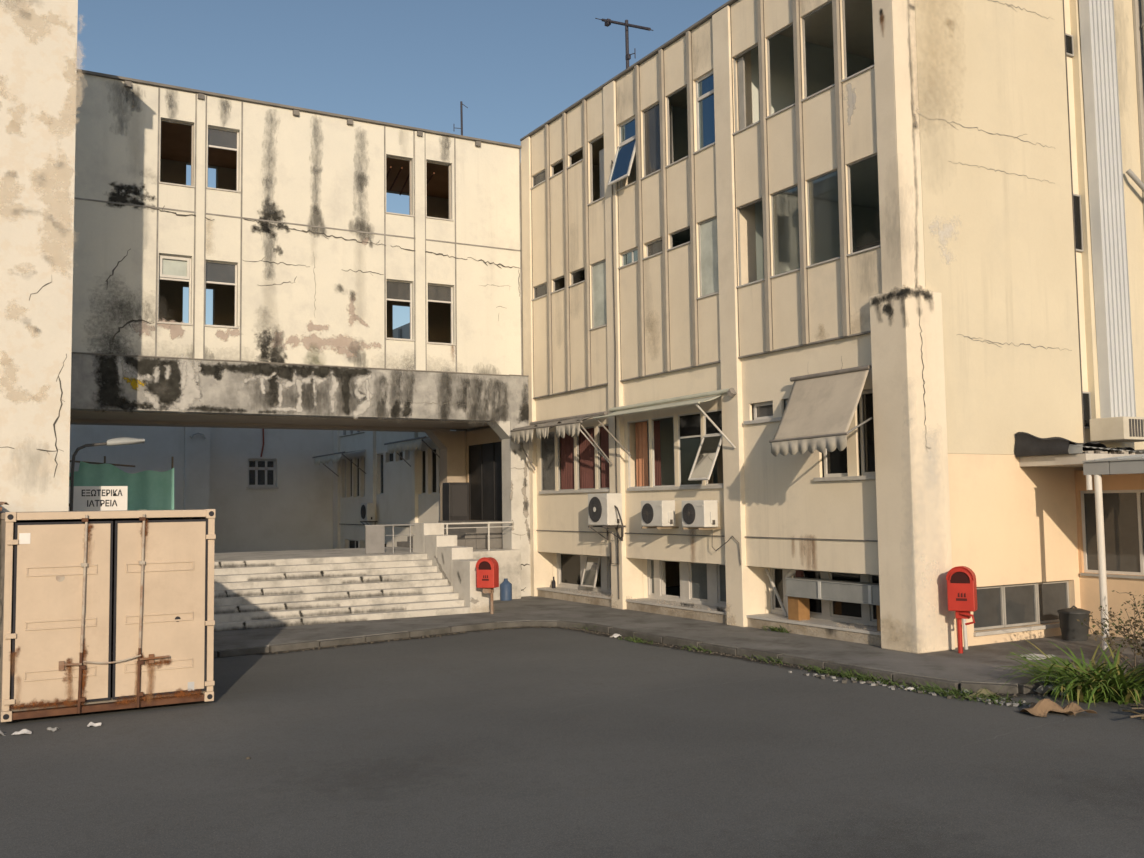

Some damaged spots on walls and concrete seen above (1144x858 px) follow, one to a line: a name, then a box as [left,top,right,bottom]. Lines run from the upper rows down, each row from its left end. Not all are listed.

crack [912,107,1050,148]
mould [108,183,155,208]
crack [148,207,214,220]
water stain [252,143,289,275]
crack [243,219,520,321]
peeling [339,286,367,326]
water stain [871,286,932,317]
peeling [272,321,381,357]
water stain [95,330,413,418]
crack [0,354,67,476]
rust [137,654,171,667]
rust [115,689,202,704]